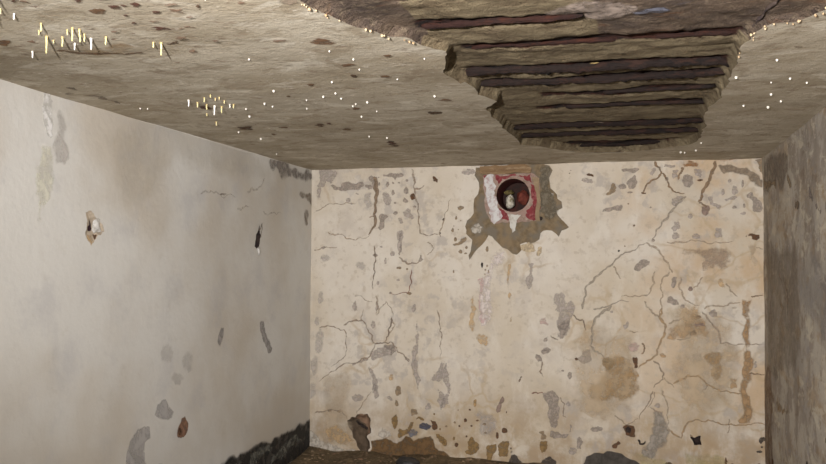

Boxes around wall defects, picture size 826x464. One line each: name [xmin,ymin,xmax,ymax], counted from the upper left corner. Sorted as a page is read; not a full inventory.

spalling [280,0,826,153]
spalling [85,211,104,245]
crack [314,174,450,379]
peeling [462,164,569,286]
crack [573,161,765,437]
crack [316,394,369,416]
flaking render [347,414,371,451]
rust [705,353,723,379]
rust [731,301,757,423]
rust [759,368,788,464]